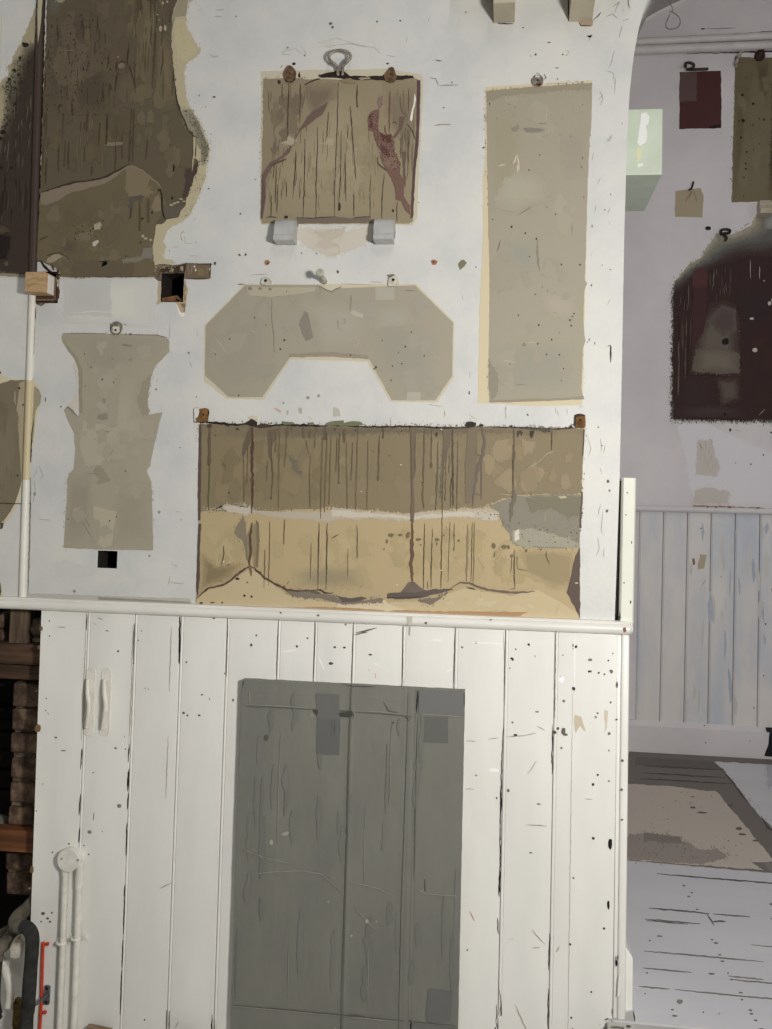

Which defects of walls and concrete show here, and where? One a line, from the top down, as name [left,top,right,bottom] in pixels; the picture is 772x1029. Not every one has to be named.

peeling [0,372,46,529]
peeling [0,0,216,319]
peeling [194,67,599,624]
peeling [668,56,772,426]
hole [0,851,30,929]